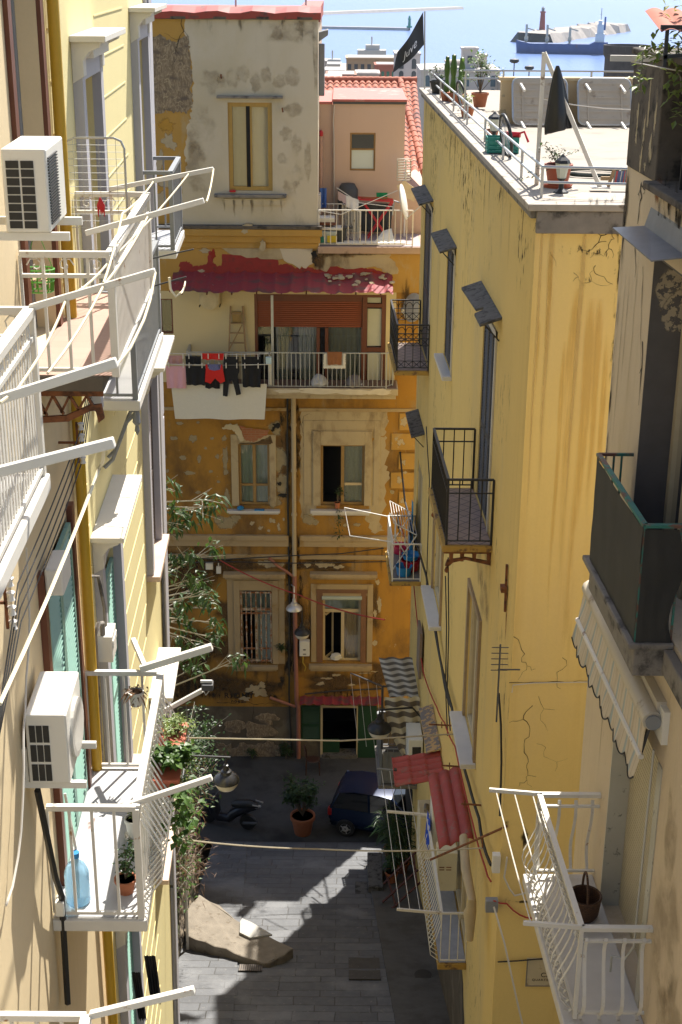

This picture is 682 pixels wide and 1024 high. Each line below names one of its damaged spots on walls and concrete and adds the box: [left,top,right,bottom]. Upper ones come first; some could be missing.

peeling [179,239,399,278]
crack [551,234,643,405]
flaking render [214,411,407,534]
spalling [215,713,281,757]
crack [509,637,576,787]